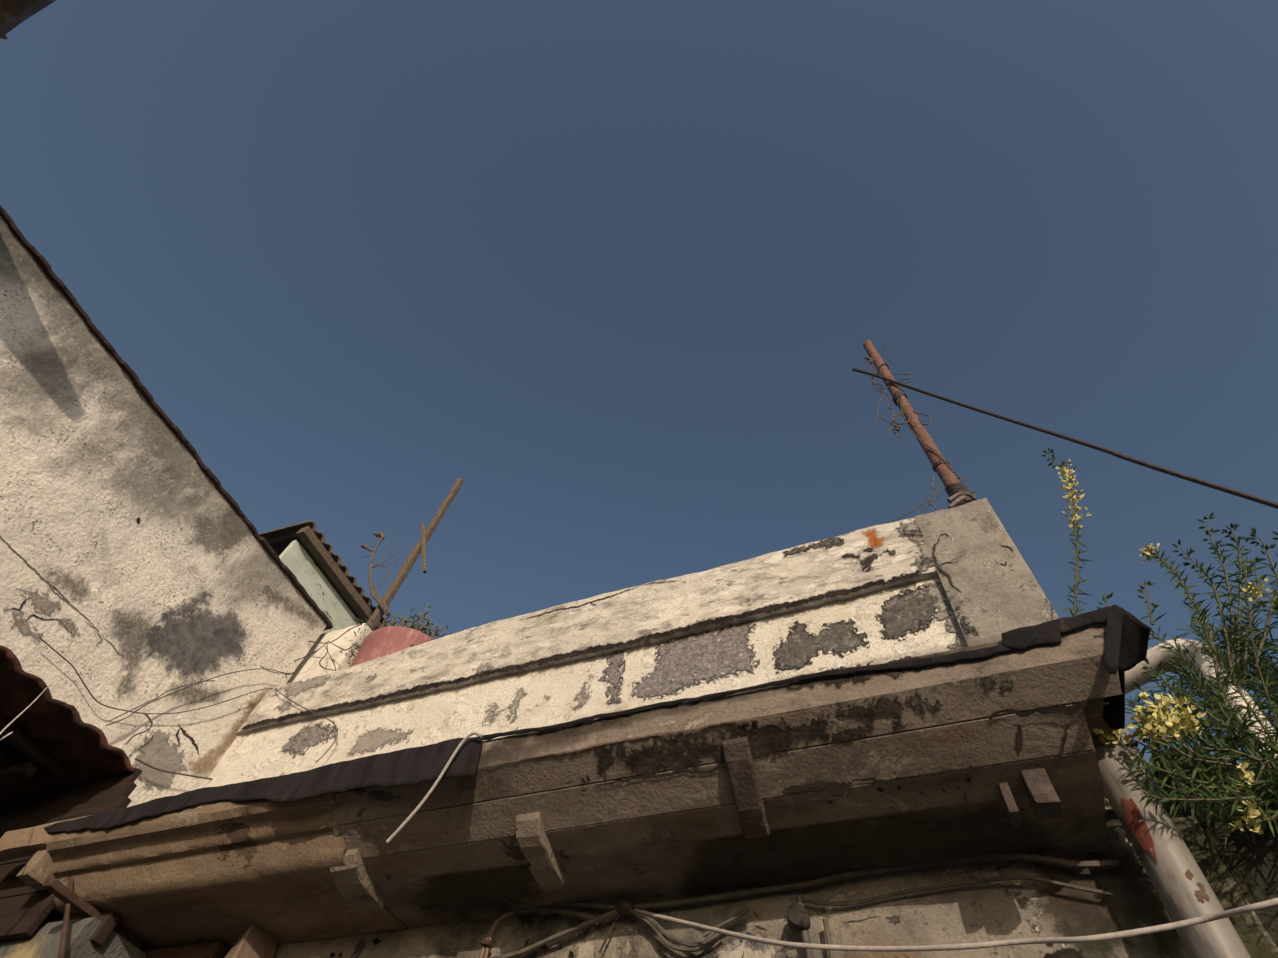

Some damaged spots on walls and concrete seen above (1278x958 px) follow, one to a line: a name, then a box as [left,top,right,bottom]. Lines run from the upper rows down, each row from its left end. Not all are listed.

rust [864,529,884,547]
crack [0,536,126,658]
damp [112,592,246,703]
peeling [571,585,980,710]
peeling [975,675,1014,693]
peeling [132,729,187,793]
peeling [279,721,341,759]
peeling [581,687,948,783]
peeling [695,932,798,958]